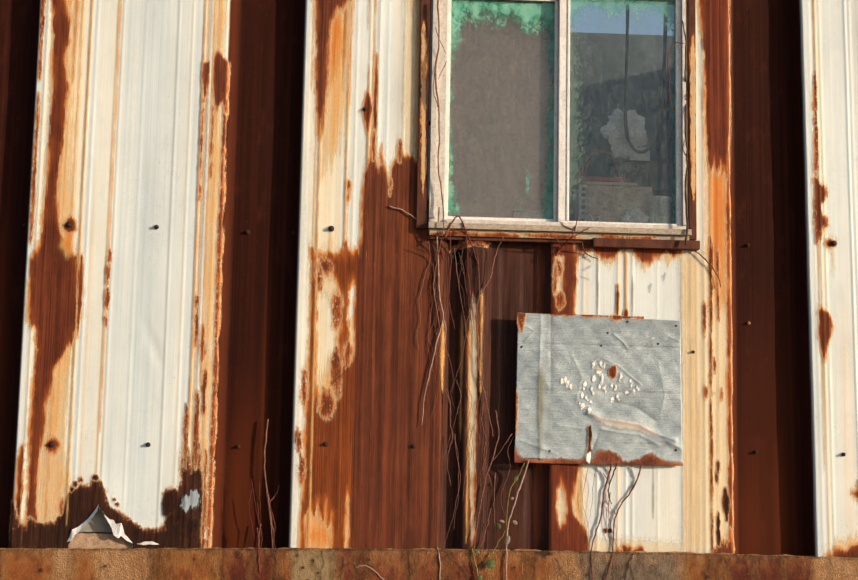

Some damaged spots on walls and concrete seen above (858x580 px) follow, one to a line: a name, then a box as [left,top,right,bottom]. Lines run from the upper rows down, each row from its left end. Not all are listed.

rust [22,0,93,527]
rust [149,0,817,580]
rust [812,5,837,421]
rust [825,536,858,559]